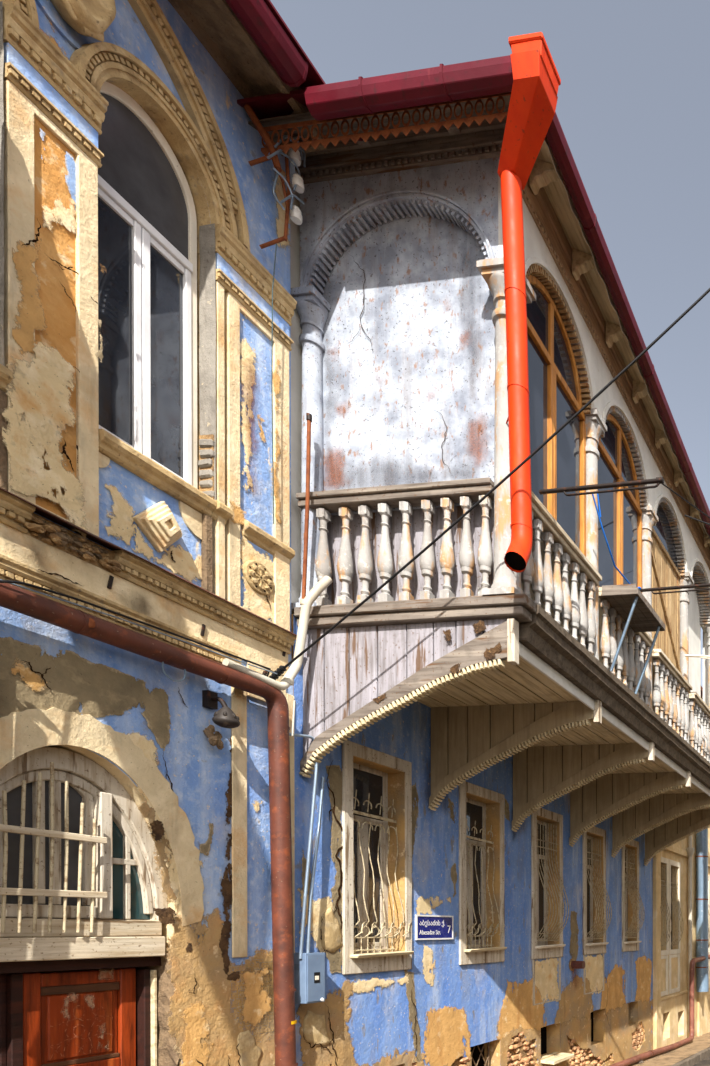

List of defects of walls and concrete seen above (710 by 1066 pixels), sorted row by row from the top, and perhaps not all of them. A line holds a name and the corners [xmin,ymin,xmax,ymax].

peeling [42,151,77,233]
crack [347,258,373,352]
peeling [2,240,88,538]
peeling [240,338,282,524]
peeling [105,484,201,582]
peeling [229,500,274,622]
peeling [0,637,171,766]
peeling [136,770,275,1066]
peeling [296,765,472,1066]
peeling [497,911,653,1066]